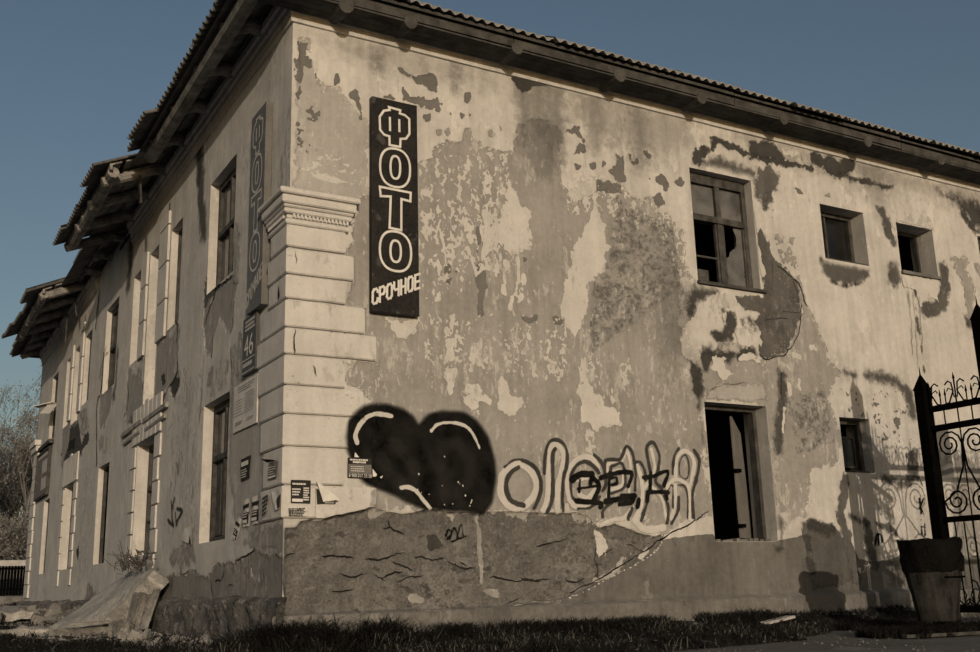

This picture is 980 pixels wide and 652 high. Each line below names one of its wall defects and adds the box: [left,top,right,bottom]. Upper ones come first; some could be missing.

water stain [196,147,206,242]
peeling [61,36,919,616]
peeling [950,255,980,327]
crack [322,511,709,604]